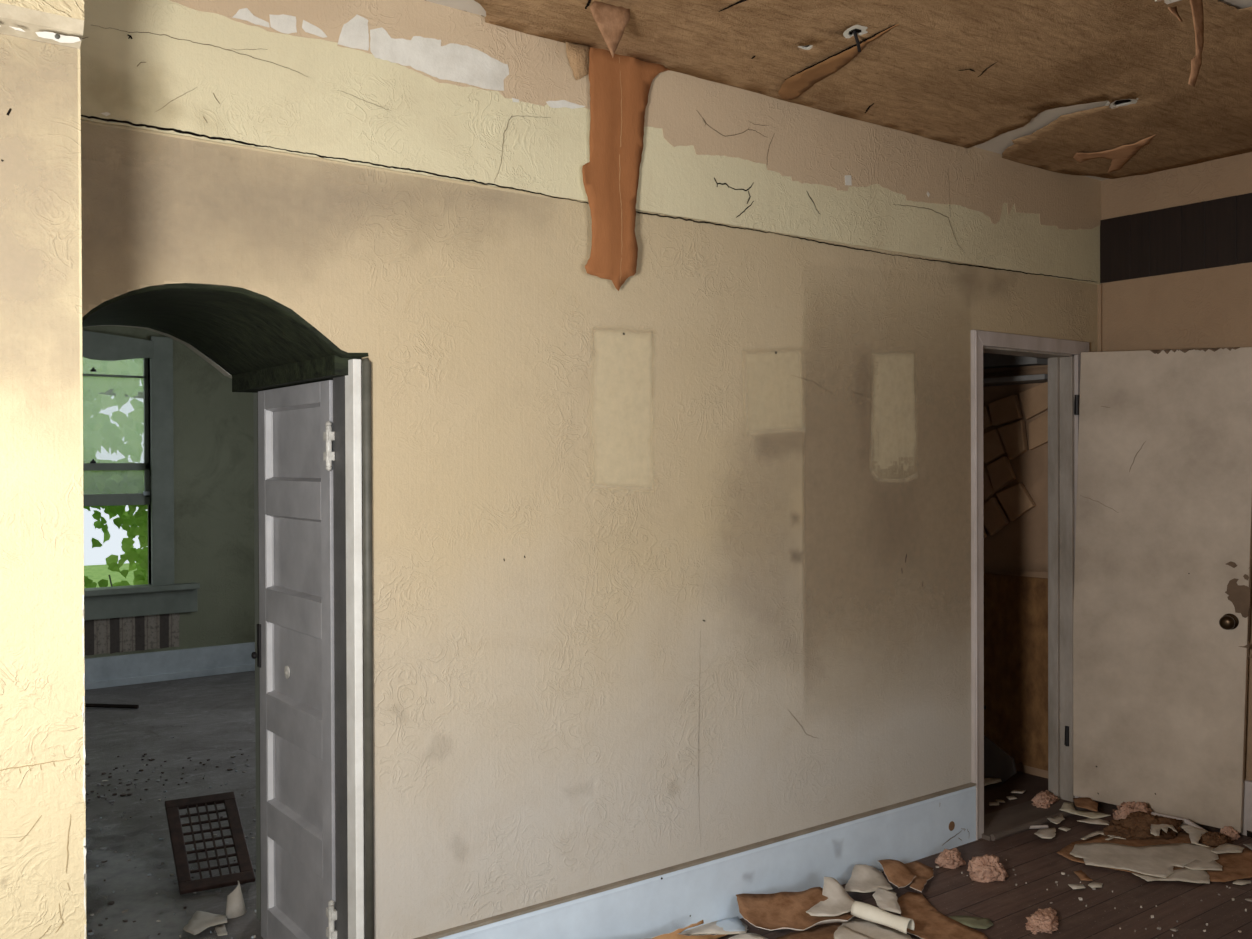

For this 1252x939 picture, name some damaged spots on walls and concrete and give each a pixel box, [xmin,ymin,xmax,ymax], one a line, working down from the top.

peeling [170,0,590,110]
crack [718,0,747,12]
crack [81,87,589,204]
crack [636,112,1094,282]
peeling [644,70,1101,230]